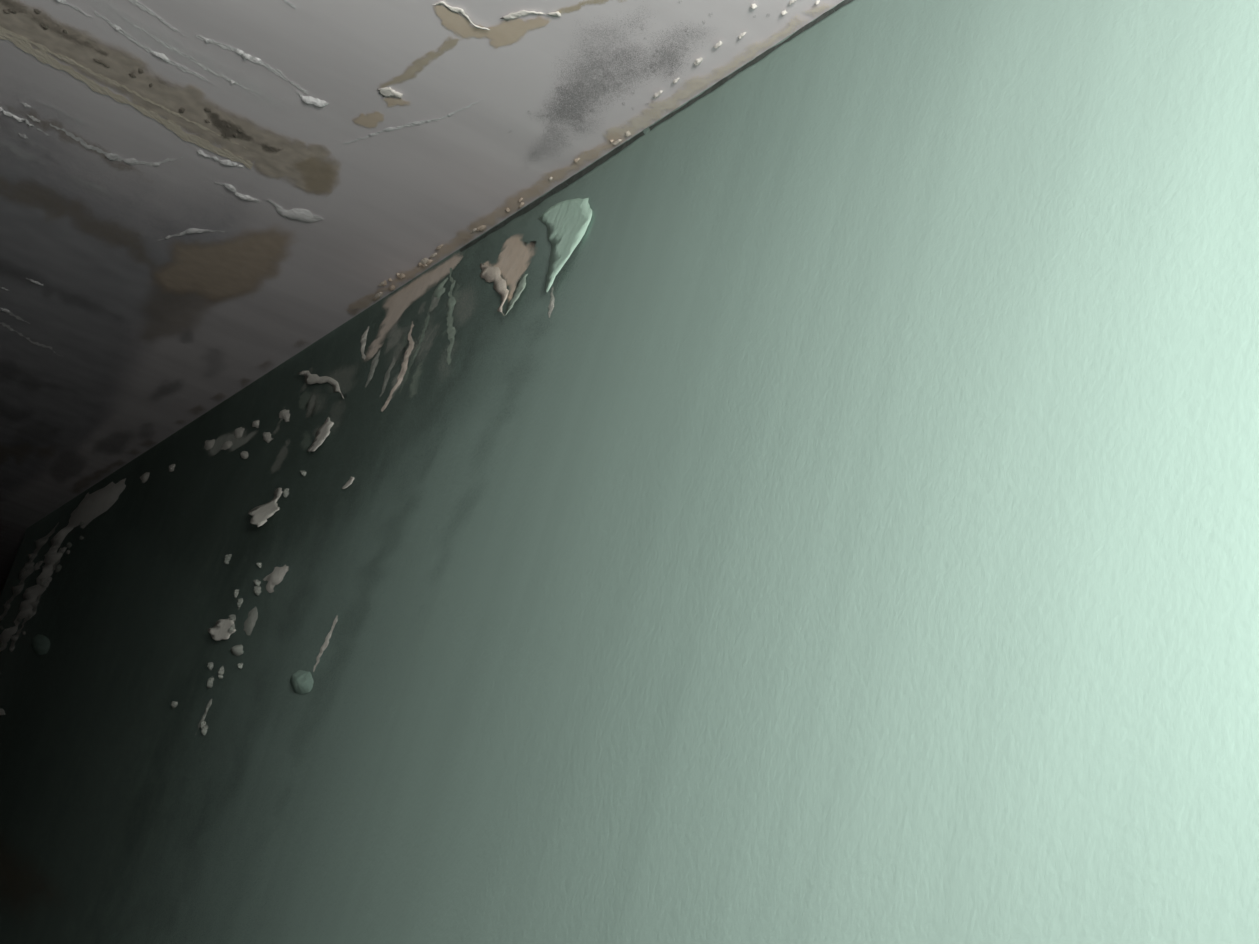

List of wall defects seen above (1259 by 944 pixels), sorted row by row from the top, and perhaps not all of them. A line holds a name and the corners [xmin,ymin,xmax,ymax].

flaking render [0,0,609,198]
damp [523,0,725,168]
flaking render [203,0,832,473]
peeling [248,487,289,527]
peeling [195,562,289,735]